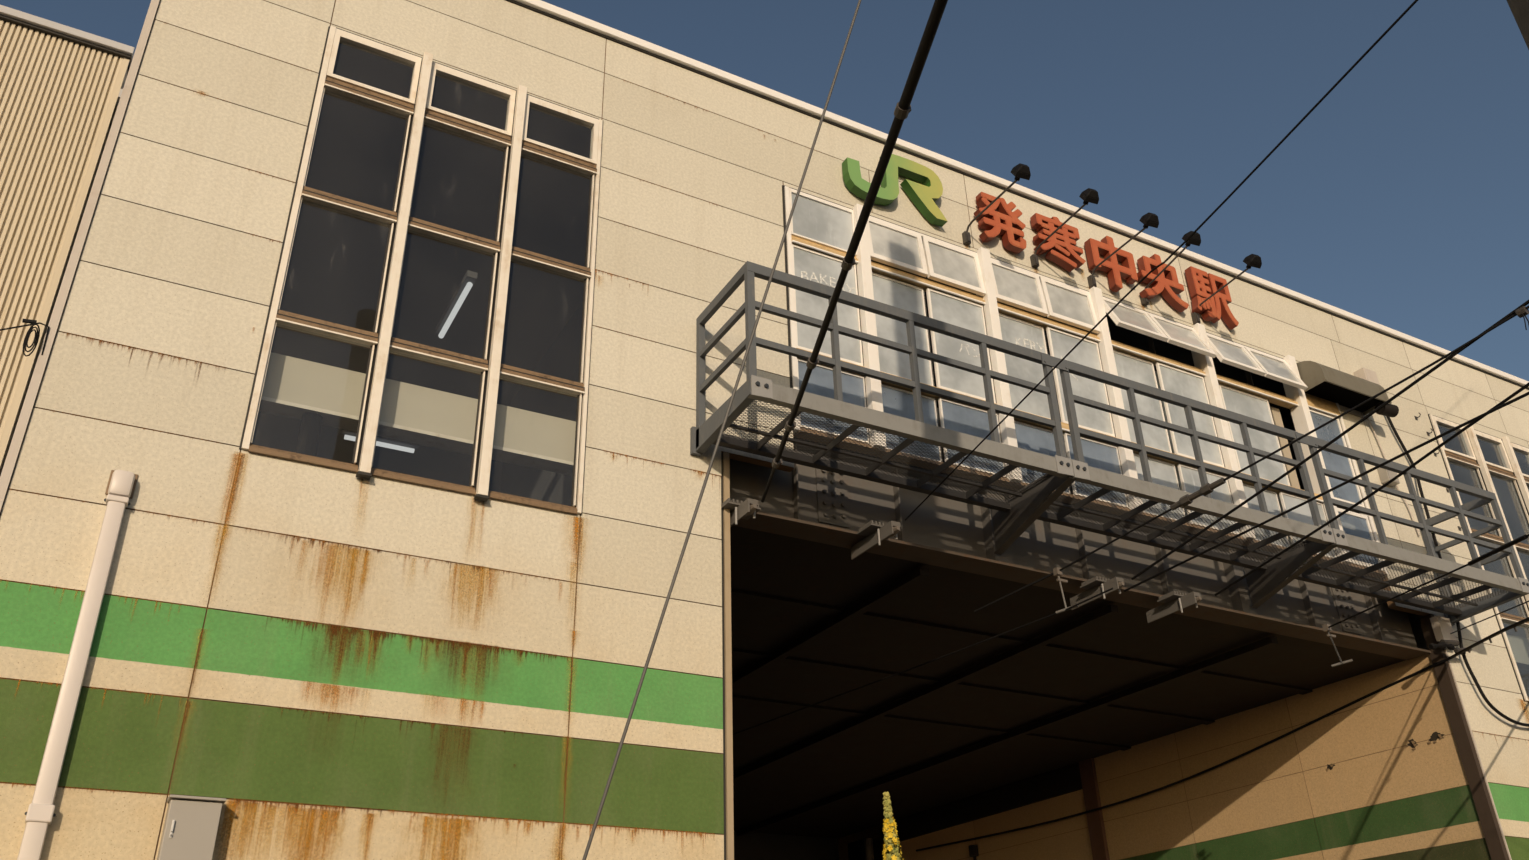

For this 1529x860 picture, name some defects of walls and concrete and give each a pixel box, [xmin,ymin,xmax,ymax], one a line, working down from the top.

corrosion [292,535,380,593]
corrosion [282,617,572,669]
corrosion [225,798,706,860]